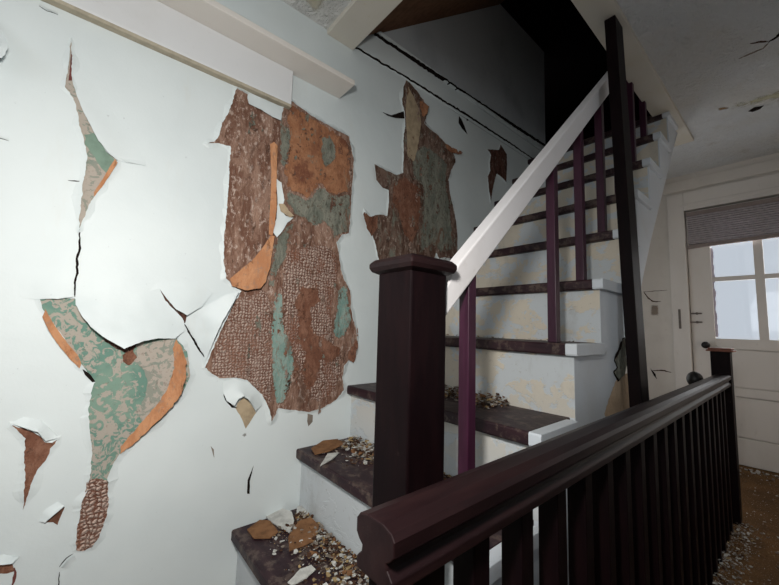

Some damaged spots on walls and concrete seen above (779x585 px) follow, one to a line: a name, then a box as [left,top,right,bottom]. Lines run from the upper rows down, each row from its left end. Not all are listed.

crack [739,33,779,59]
flaking render [487,144,508,204]
flaking render [202,80,463,436]
flaking render [6,417,62,511]
flaking render [39,502,65,525]